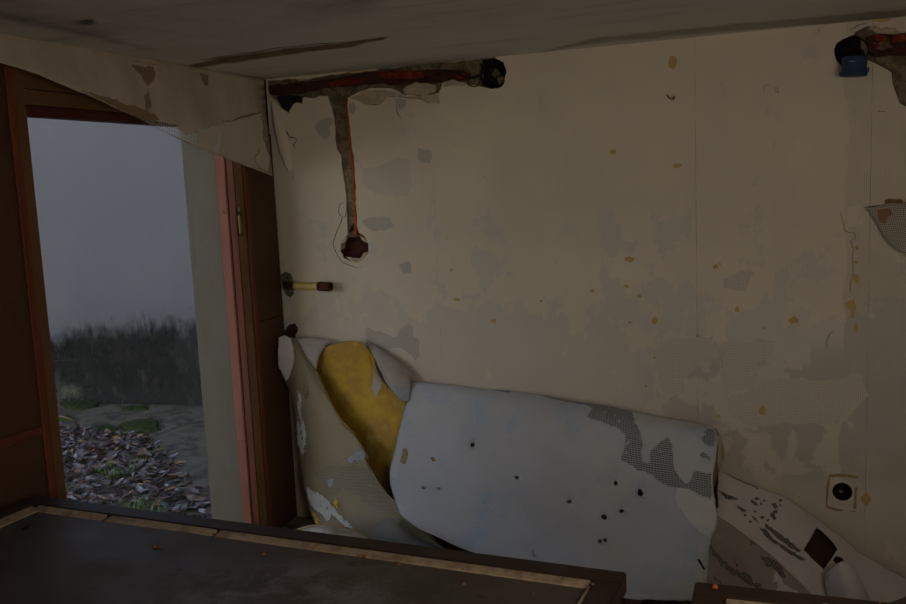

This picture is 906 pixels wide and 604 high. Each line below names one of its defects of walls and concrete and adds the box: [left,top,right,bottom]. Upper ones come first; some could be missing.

flaking render [865,34,906,57]
flaking render [268,69,471,96]
peeling [863,199,906,253]